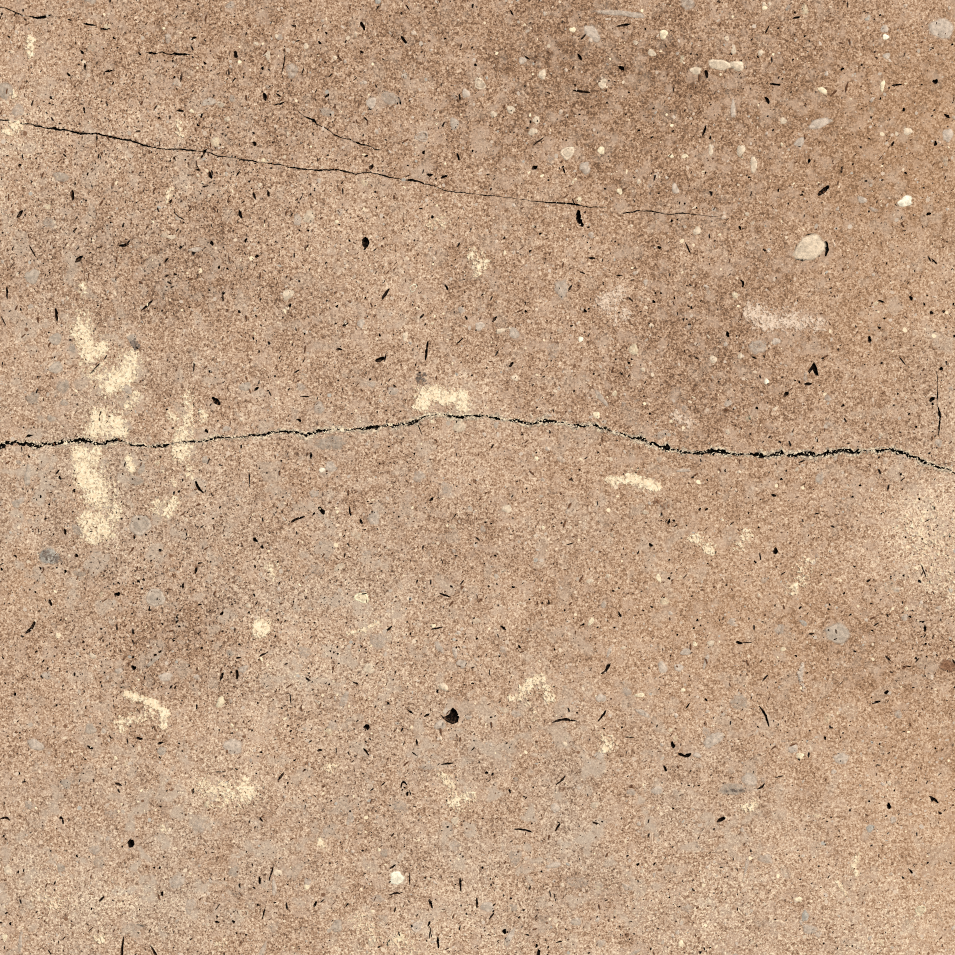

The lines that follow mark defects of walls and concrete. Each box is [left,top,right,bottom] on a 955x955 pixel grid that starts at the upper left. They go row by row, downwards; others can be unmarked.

crack [0,46,717,217]
crack [934,371,942,436]
crack [0,411,955,476]